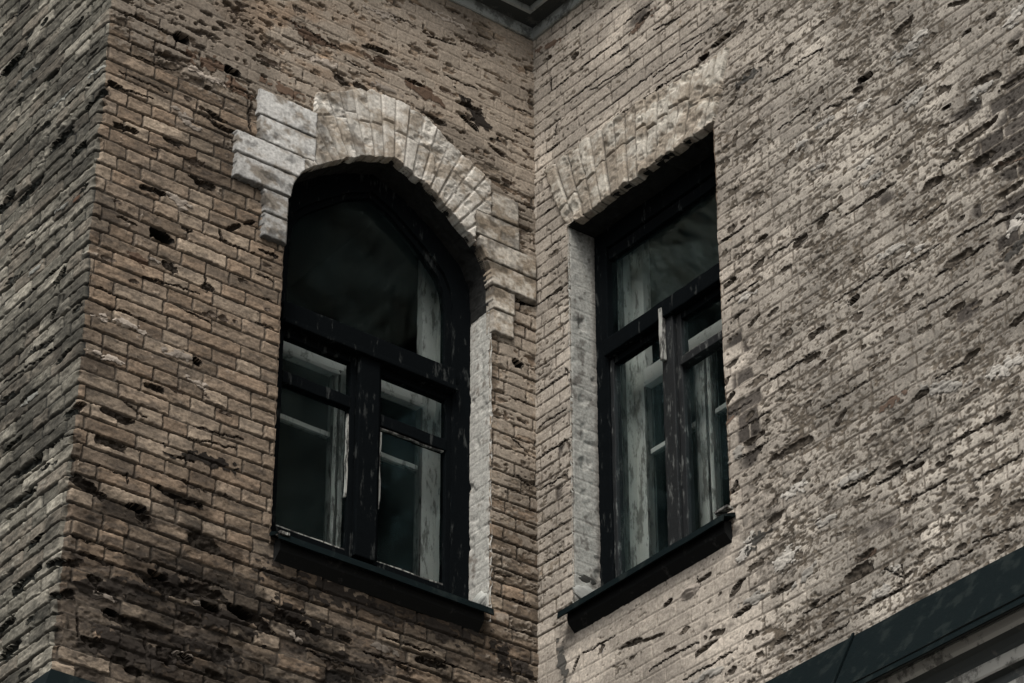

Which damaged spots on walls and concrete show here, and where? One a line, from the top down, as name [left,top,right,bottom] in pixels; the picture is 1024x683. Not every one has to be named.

spalling [439,86,484,132]
spalling [920,174,947,194]
spalling [993,180,1023,200]
spalling [149,226,193,245]
spalling [943,215,1011,269]
crack [512,373,568,490]
spalling [69,474,107,502]
spalling [125,502,152,524]
spalling [12,558,159,635]
spalling [139,568,320,636]
spalling [80,635,144,678]
spalling [618,632,665,661]